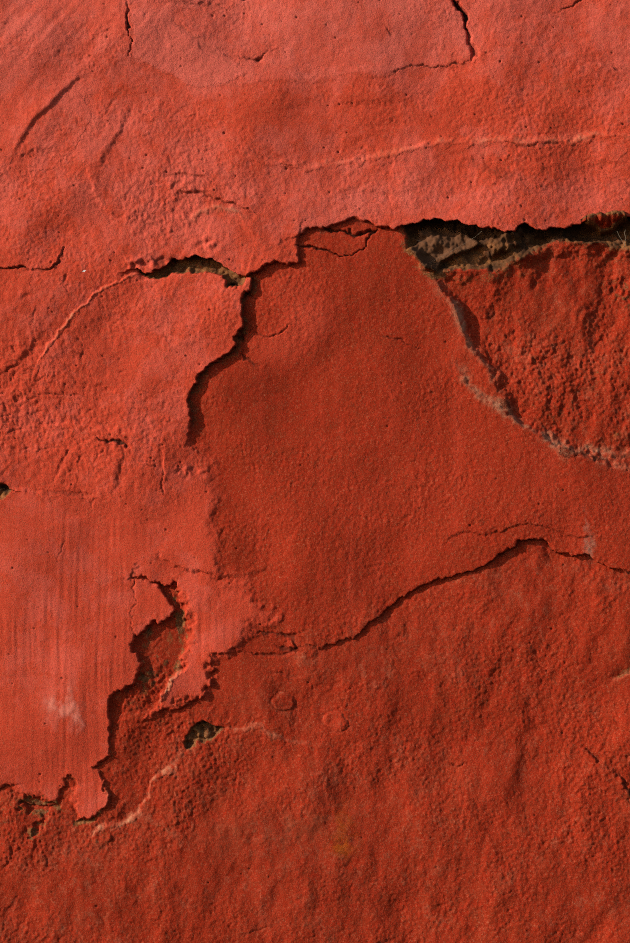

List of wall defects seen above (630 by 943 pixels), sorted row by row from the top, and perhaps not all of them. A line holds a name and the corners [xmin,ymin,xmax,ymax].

crack [382,0,479,77]
crack [0,243,71,286]
peeling [0,210,630,943]
crack [230,522,630,658]